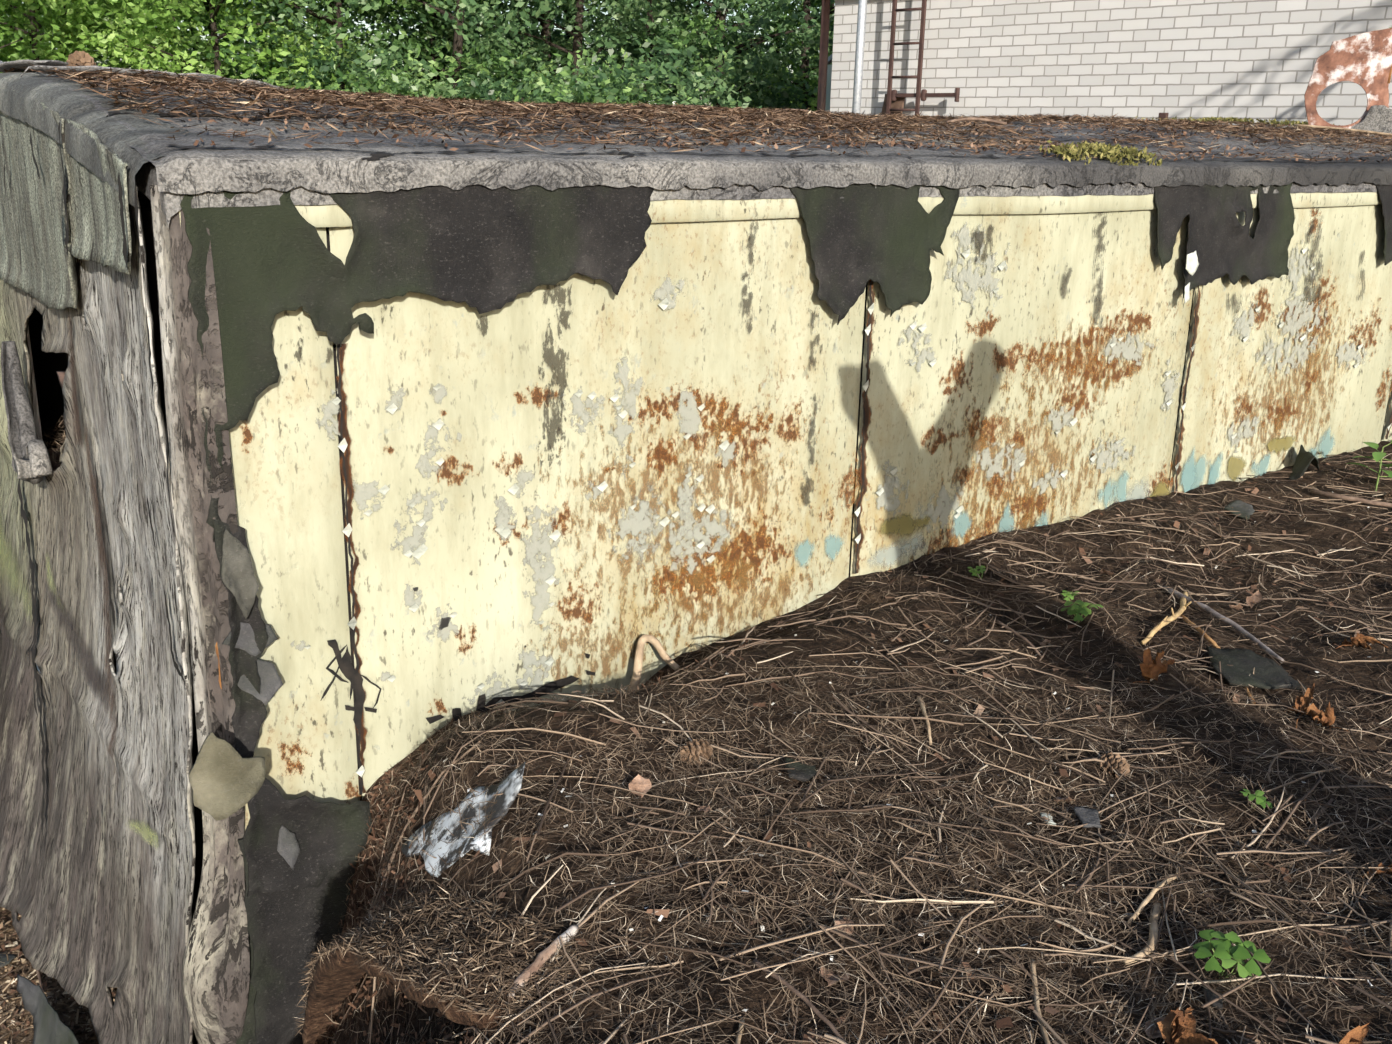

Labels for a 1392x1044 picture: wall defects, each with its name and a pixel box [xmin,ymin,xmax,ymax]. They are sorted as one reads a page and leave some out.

peeling [385,387,406,414]
corrosion [437,385,833,695]
corrosion [881,306,1159,570]
corrosion [1147,464,1176,497]
corrosion [1212,271,1392,472]